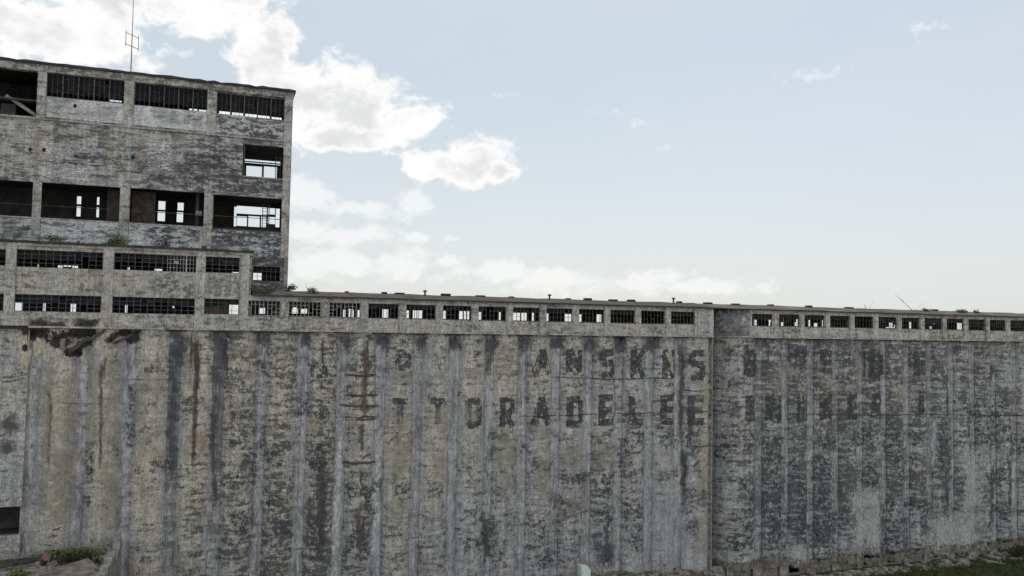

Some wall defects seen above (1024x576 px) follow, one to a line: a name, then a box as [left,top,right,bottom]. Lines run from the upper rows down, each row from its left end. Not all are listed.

spalling [17,319,141,370]
damp [166,332,232,507]
corrosion [339,394,380,421]
peeling [82,441,110,511]